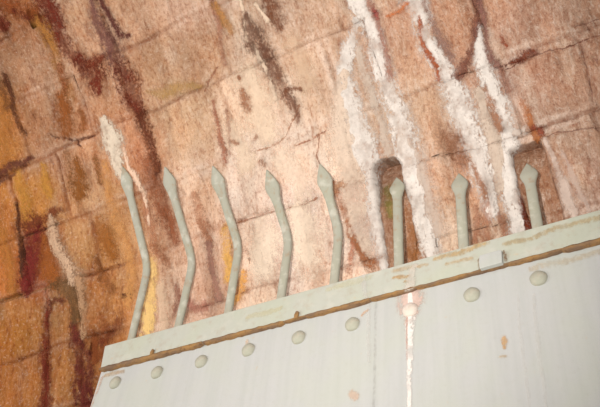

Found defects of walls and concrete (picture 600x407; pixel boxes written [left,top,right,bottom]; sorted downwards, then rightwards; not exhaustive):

rust [418,17,440,81]
water stain [402,0,578,234]
crack [494,23,600,99]
rust [193,193,223,302]
rust [68,237,600,407]
water stain [328,0,445,407]